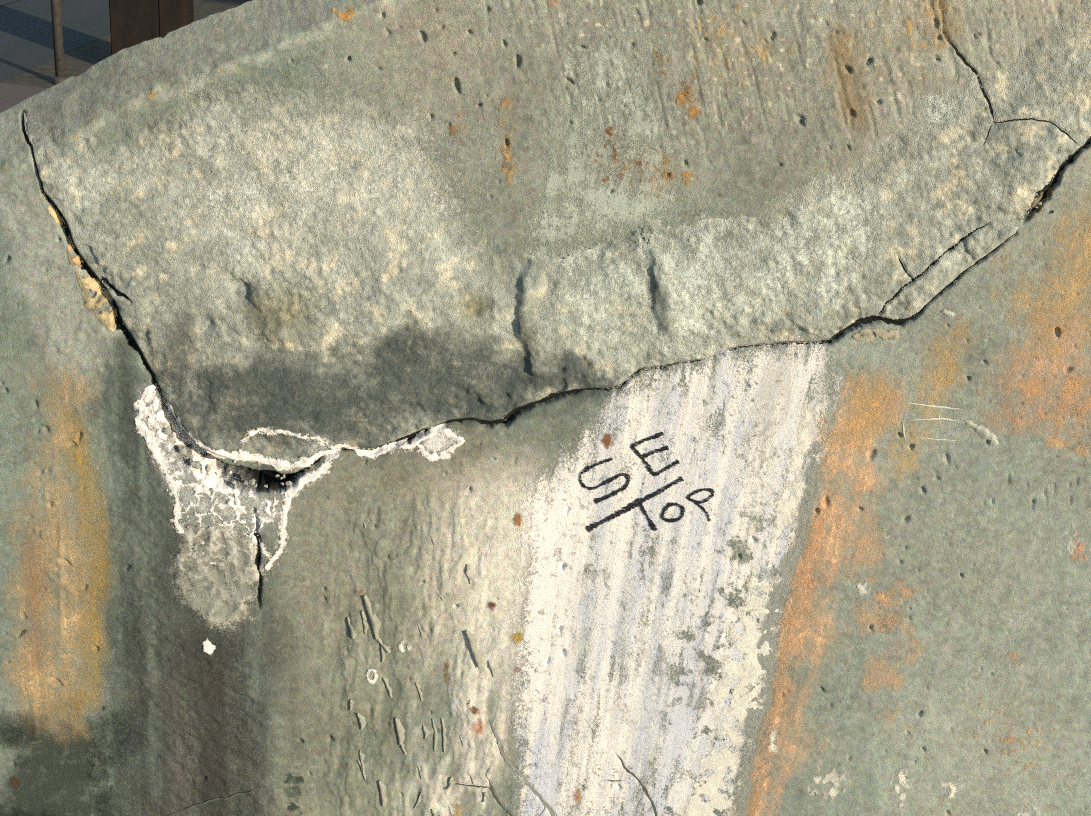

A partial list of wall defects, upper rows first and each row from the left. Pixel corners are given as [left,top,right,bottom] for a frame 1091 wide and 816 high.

damp [913,73,984,135]
crack [22,113,164,398]
crack [298,0,1091,473]
corrosion [1011,223,1091,422]
damp [0,37,893,816]
corrosion [827,397,881,492]
corrosion [12,481,105,725]
crack [254,511,262,605]
corrosion [788,493,856,659]
crack [455,719,555,816]
crack [604,755,657,816]
corrosion [753,701,800,816]